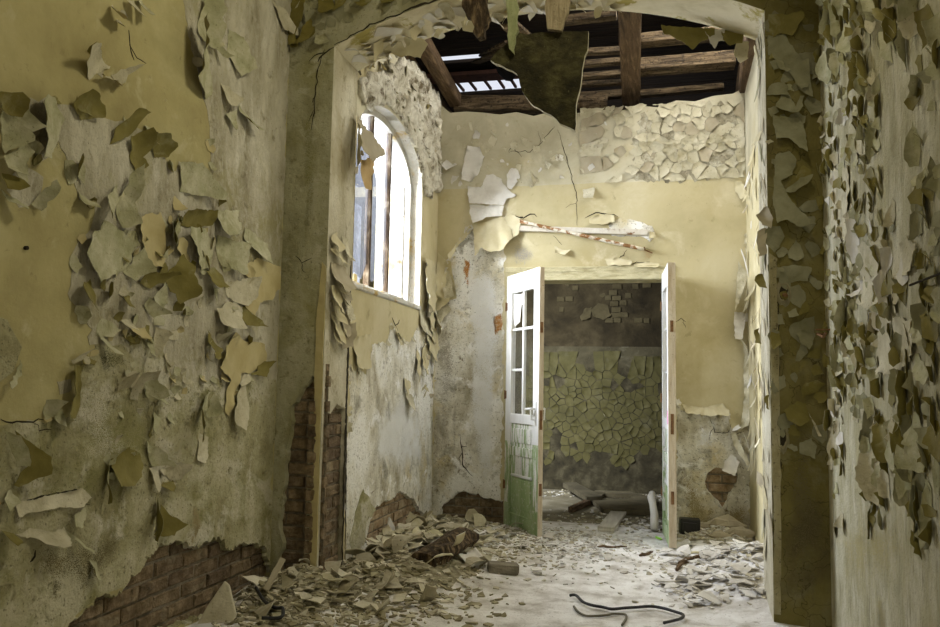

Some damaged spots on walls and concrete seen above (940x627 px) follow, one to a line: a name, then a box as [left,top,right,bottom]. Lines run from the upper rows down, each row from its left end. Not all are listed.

crack [309,0,437,129]
crack [509,131,618,217]
peeling [0,0,563,627]
peeling [568,0,940,560]
peeling [525,351,662,470]